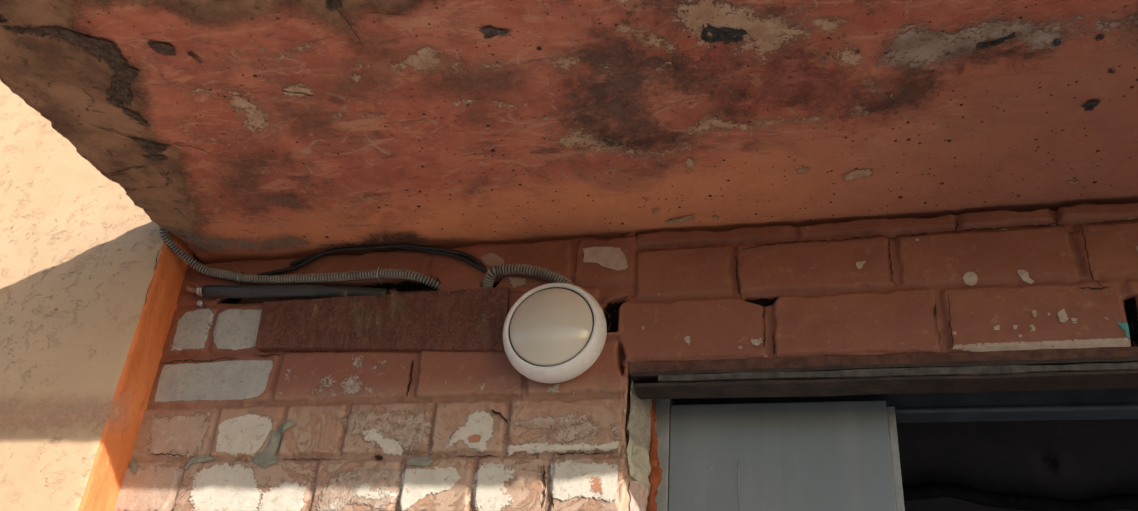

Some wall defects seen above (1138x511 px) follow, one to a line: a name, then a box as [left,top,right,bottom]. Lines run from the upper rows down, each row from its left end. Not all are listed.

peeling [0,0,424,238]
peeling [389,46,462,75]
spalling [475,26,512,39]
damp [563,33,714,154]
peeling [612,0,1138,102]
spalling [1082,101,1102,111]
peeling [582,246,628,271]
crack [641,209,1138,355]
peeling [952,309,1138,352]
peeling [115,308,658,511]